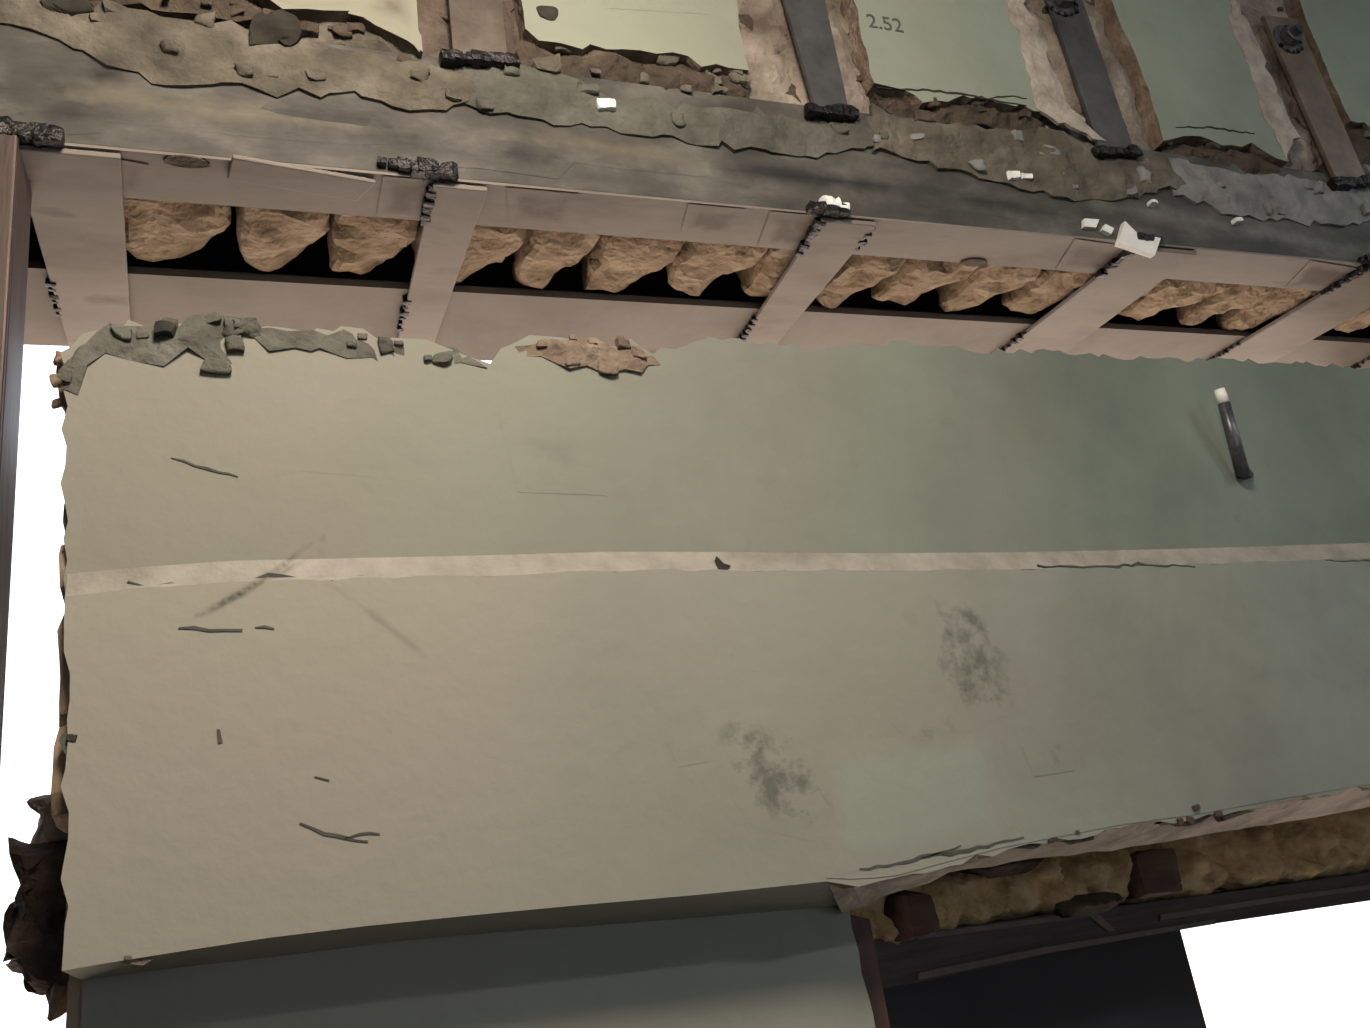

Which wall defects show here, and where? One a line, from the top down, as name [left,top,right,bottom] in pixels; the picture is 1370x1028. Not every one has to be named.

spalling [41,0,430,82]
spalling [536,5,558,21]
spalling [503,39,751,98]
spalling [856,0,1107,190]
spalling [1158,0,1300,188]
peeling [1127,166,1155,198]
spalling [1345,128,1370,166]
spalling [123,197,423,275]
spalling [455,225,795,296]
spalling [816,254,1096,314]
damp [892,589,1028,747]
damp [667,699,834,842]